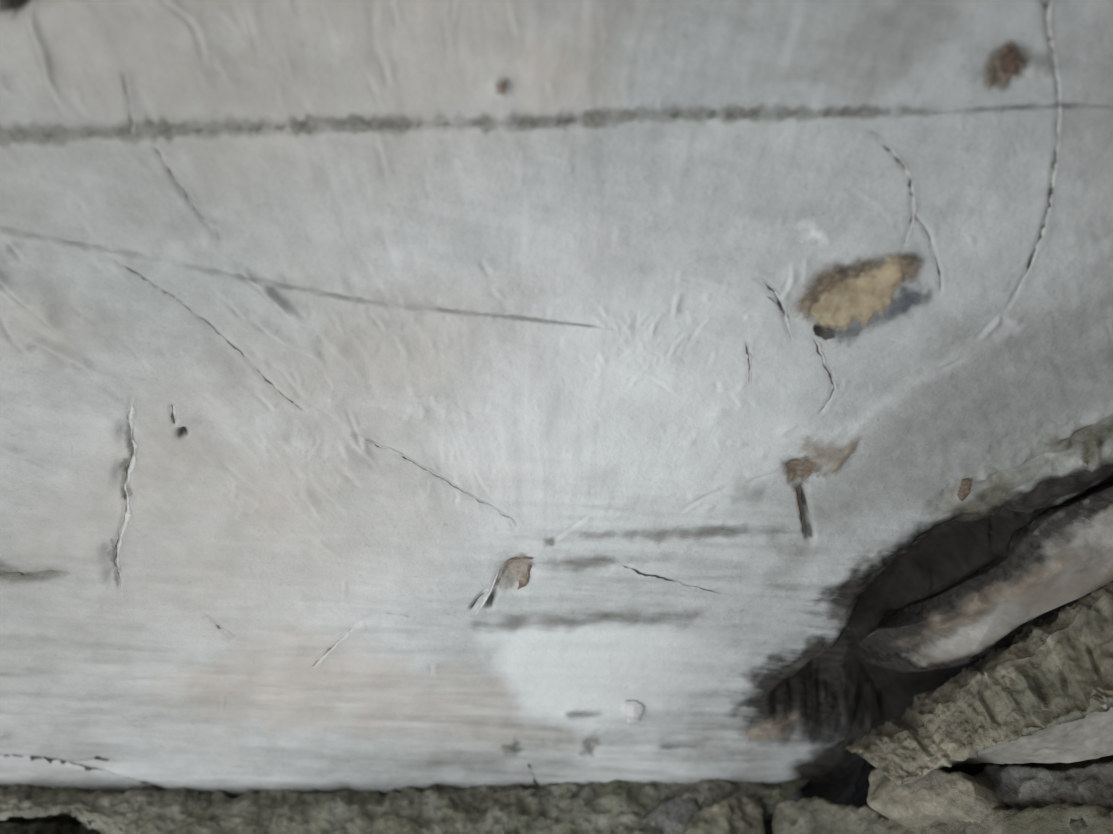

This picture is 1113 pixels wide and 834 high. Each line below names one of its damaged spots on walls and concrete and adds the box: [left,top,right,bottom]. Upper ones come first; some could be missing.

crack [871,128,940,289]
crack [1011,0,1063,305]
crack [112,396,138,593]
crack [170,405,178,425]
spalling [956,479,972,501]
damp [739,424,1113,805]